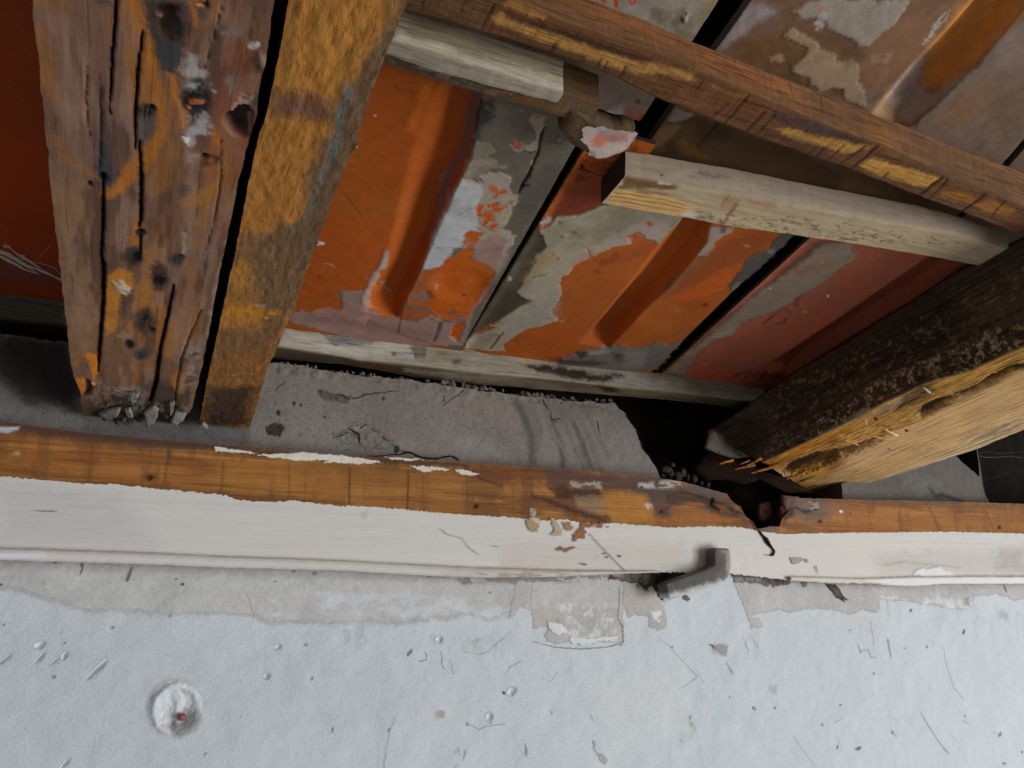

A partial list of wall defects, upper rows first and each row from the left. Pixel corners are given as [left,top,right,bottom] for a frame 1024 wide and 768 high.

crack [334,424,459,461]
peeling [526,517,609,552]
peeling [0,560,690,646]